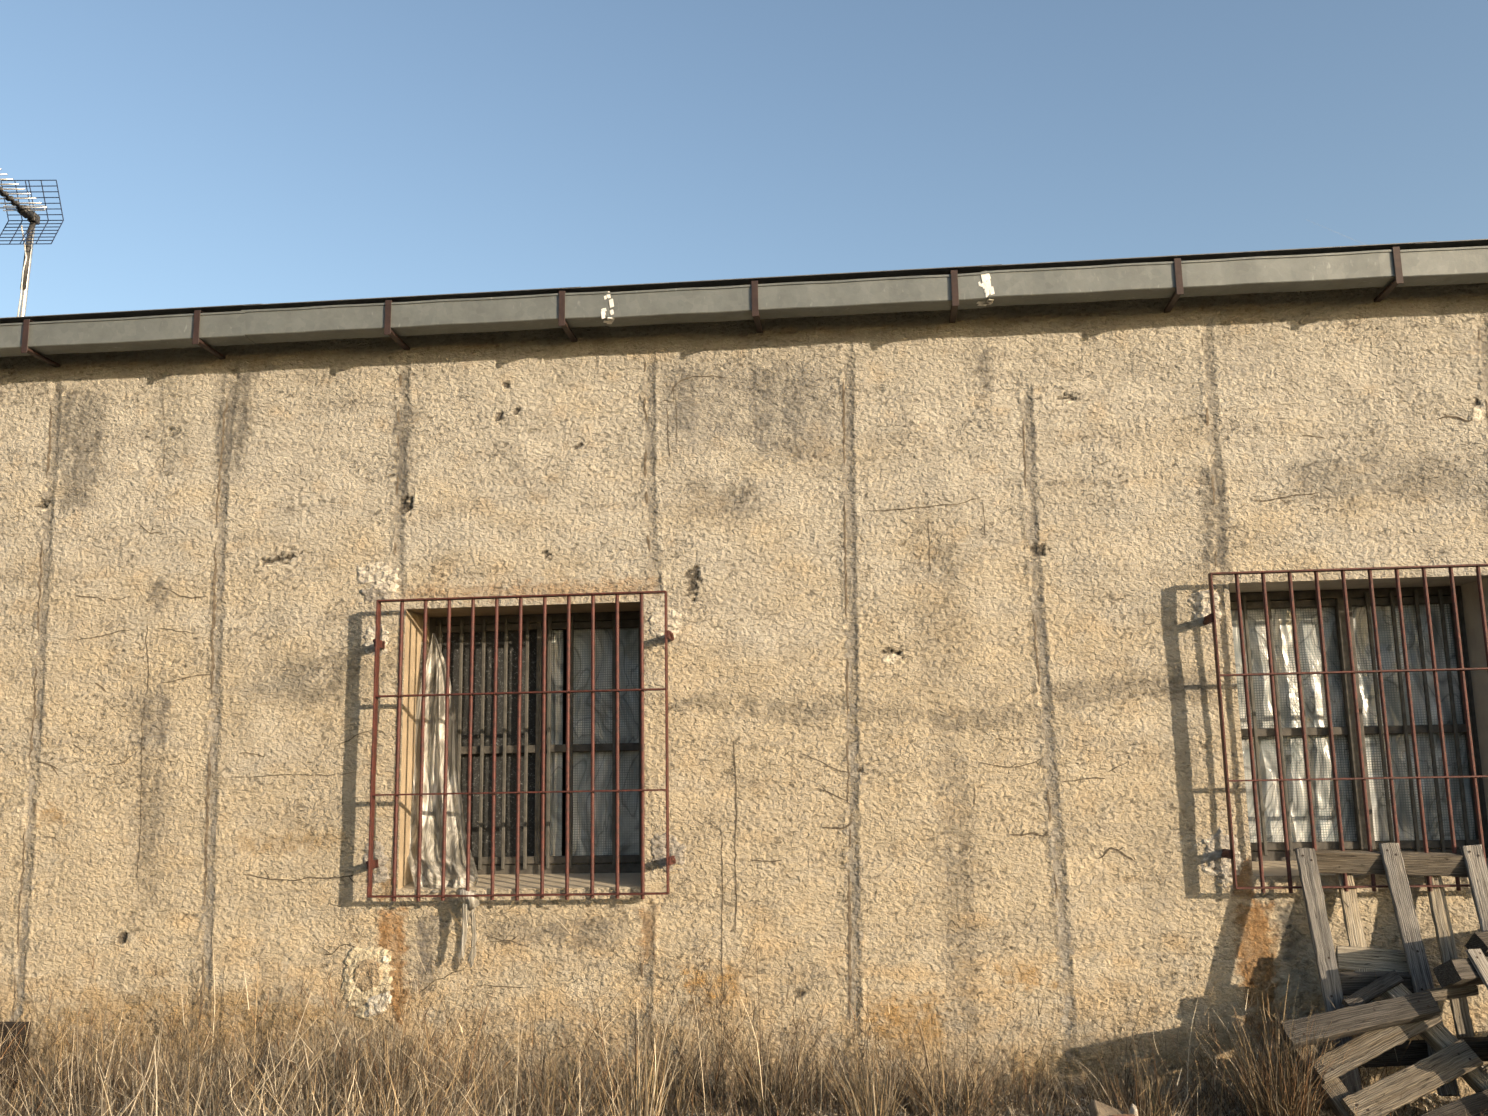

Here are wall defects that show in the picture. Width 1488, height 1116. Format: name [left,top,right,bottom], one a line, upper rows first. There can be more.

peeling [340,946,396,1024]
rust [391,987,399,1022]
rust [1236,866,1274,1041]